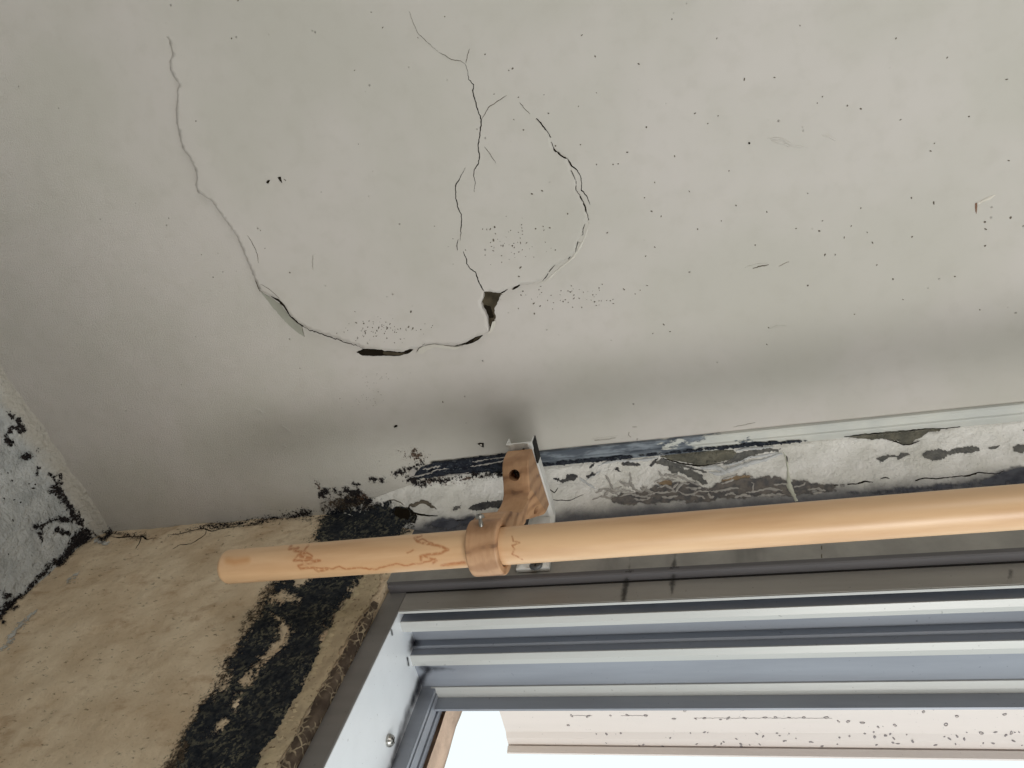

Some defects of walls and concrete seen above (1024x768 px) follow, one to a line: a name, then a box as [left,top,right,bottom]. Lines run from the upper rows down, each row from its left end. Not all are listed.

crack [410,14,590,293]
crack [249,238,364,350]
leakage [0,411,156,624]
leakage [170,477,438,549]
peeling [425,500,503,531]
spalling [550,446,782,501]
spalling [844,426,1000,462]
leakage [161,575,364,768]